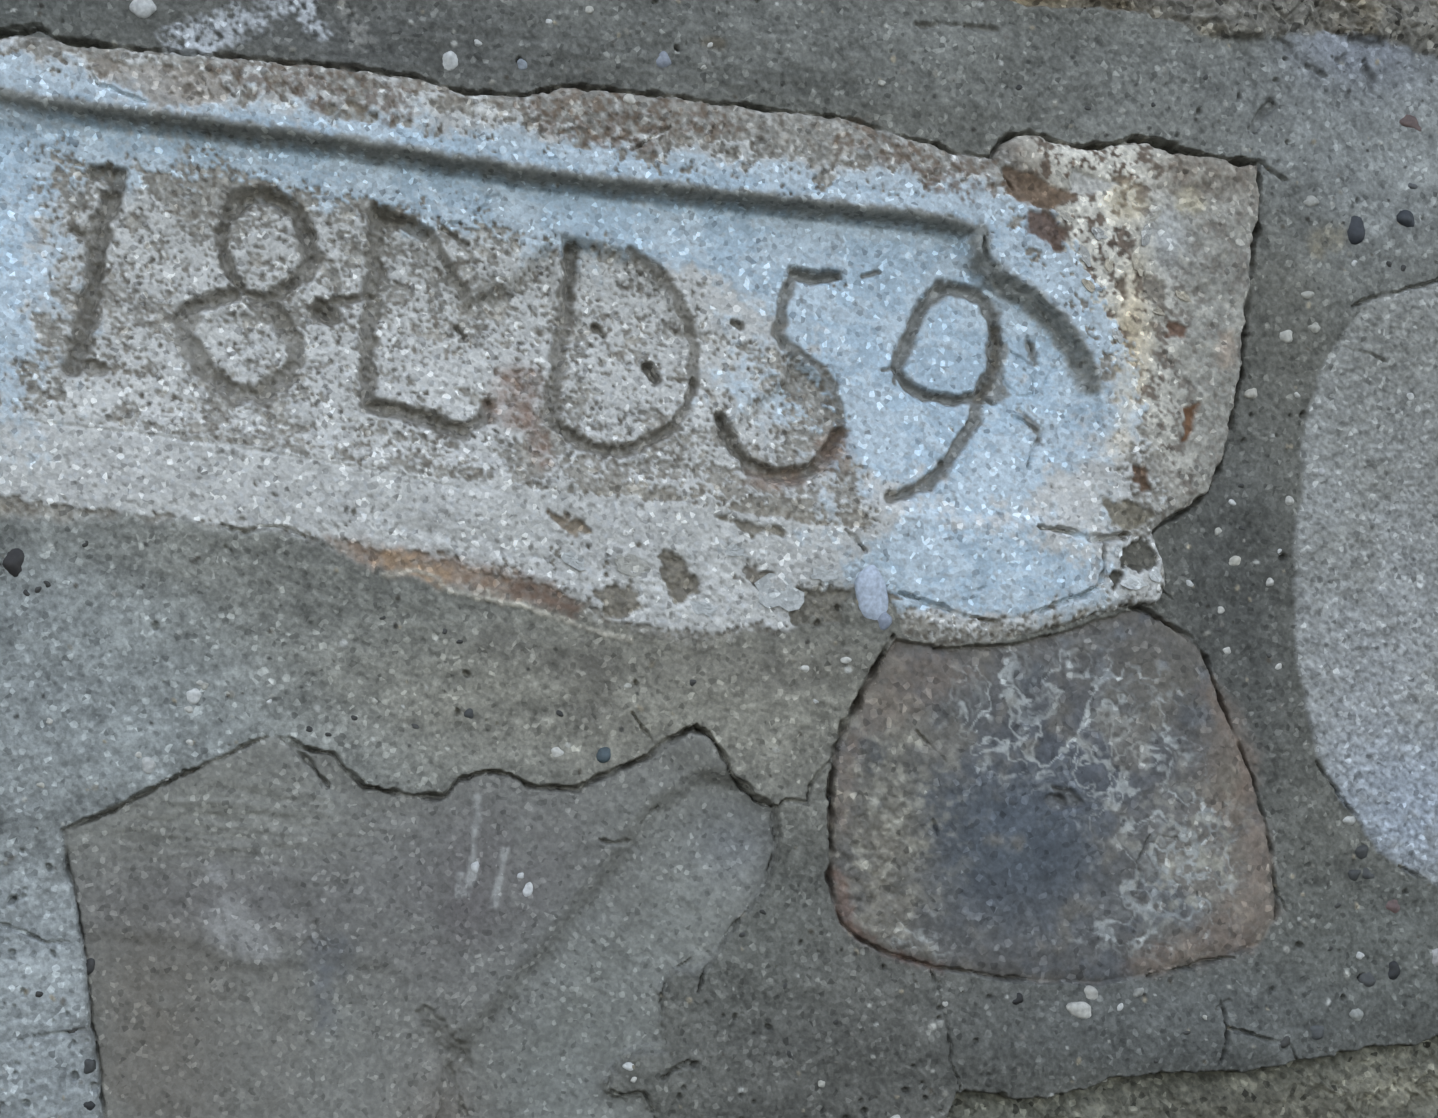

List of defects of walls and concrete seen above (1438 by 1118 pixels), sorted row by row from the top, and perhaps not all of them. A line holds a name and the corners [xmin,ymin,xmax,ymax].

crack [0,22,1290,923]
crack [0,633,1035,1118]
crack [1145,955,1300,1067]